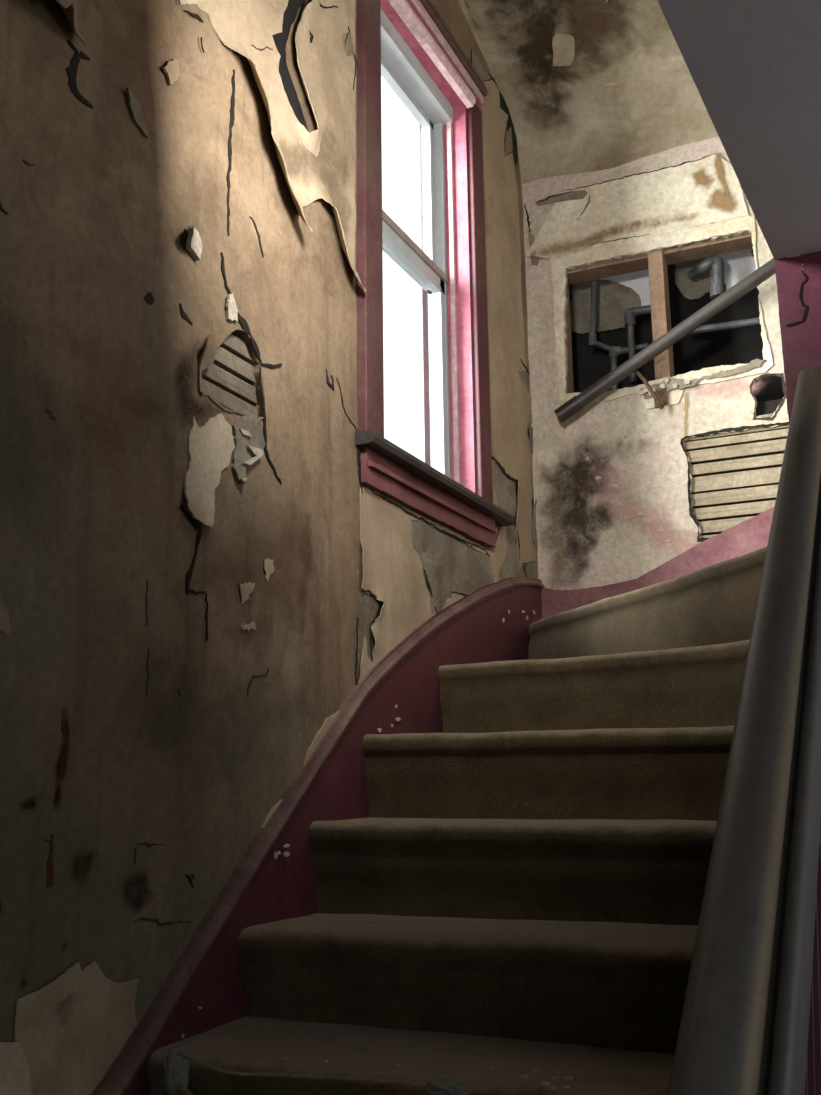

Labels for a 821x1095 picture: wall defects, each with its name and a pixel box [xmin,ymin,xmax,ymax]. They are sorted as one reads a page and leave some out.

spalling [178,0,204,23]
water stain [497,0,625,122]
peeling [186,225,202,261]
crack [221,69,282,484]
flaking render [674,249,756,300]
crack [785,254,808,327]
crack [180,505,208,642]
flaking render [184,413,265,527]
flaking render [412,456,538,614]
water stain [547,447,611,587]
flaking render [354,588,382,685]
peeling [0,961,139,1095]